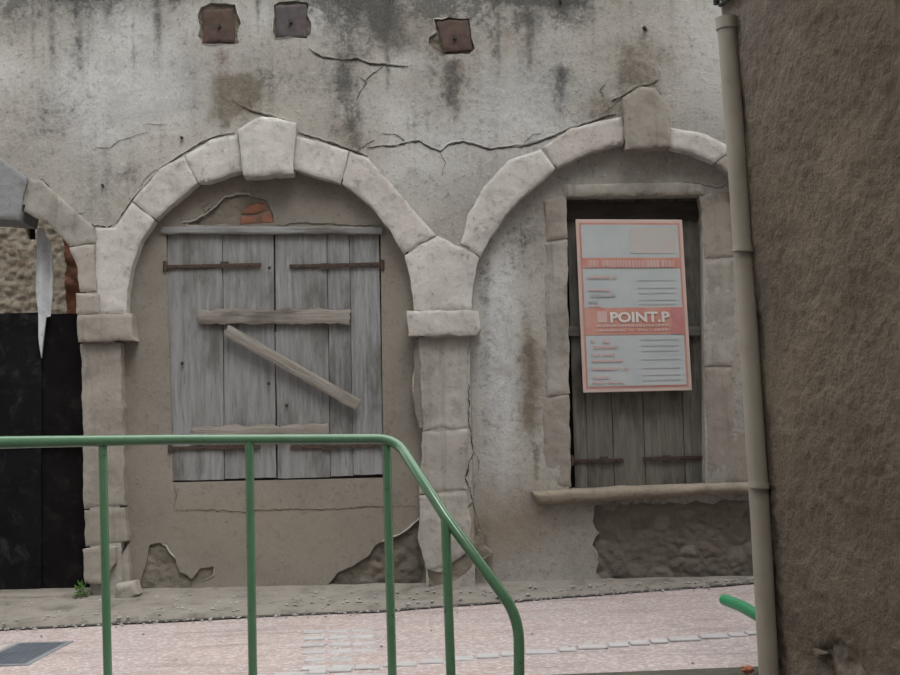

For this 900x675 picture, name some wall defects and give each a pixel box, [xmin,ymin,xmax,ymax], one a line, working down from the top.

crack [309,47,408,100]
crack [218,78,659,175]
crack [79,131,235,228]
crack [182,192,250,224]
flaking render [141,543,215,589]
flaking render [329,517,493,587]
flaking render [590,499,753,579]
flaking render [812,641,867,675]